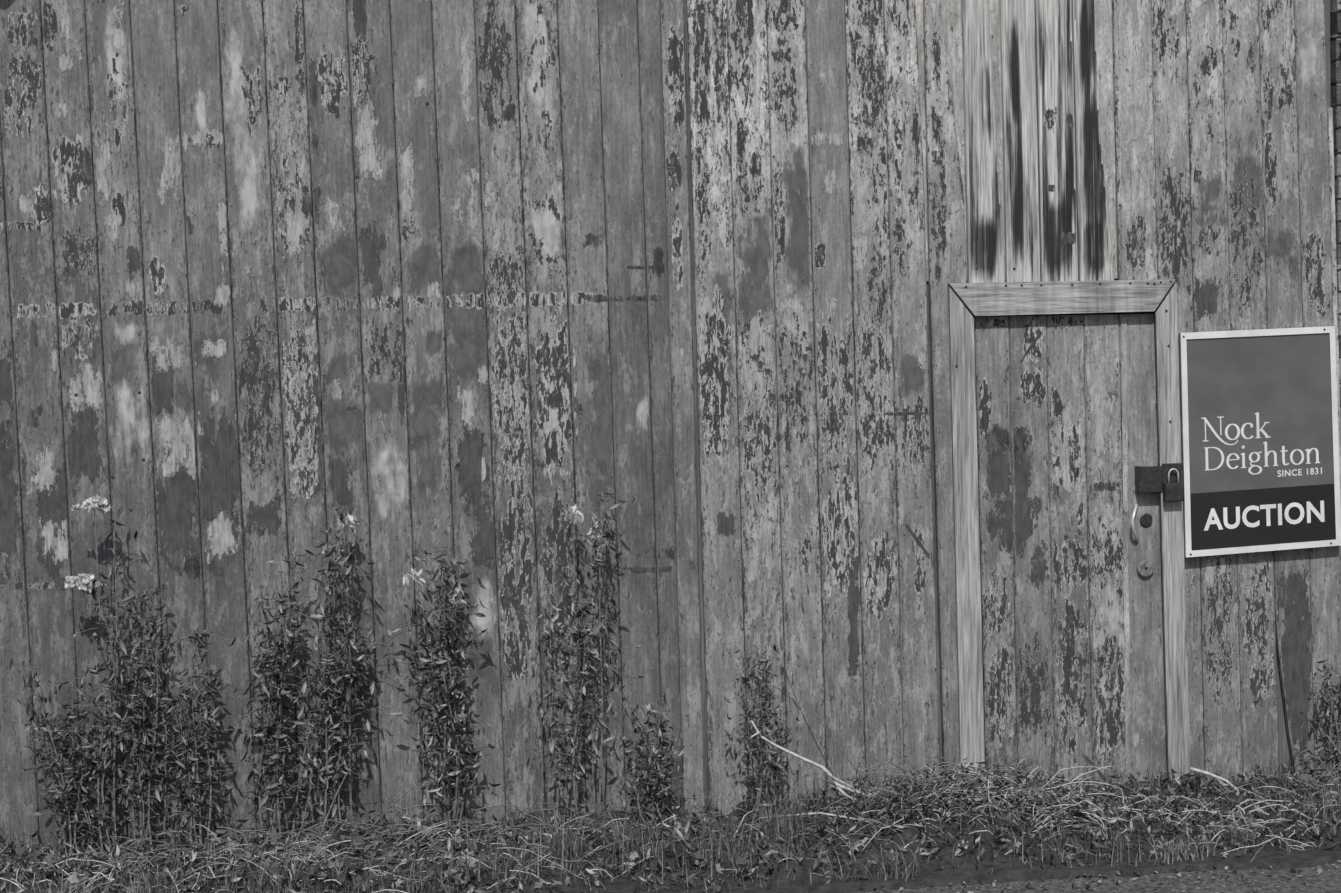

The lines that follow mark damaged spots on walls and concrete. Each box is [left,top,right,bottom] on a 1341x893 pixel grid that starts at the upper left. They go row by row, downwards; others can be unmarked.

peeling [0,0,58,140]
peeling [241,0,377,136]
peeling [29,133,96,277]
peeling [29,312,99,367]
peeling [111,185,126,233]
peeling [235,304,320,499]
peeling [277,130,321,274]
peeling [364,298,413,384]
peeling [582,0,960,631]
peeling [1122,0,1296,330]
peeling [1303,228,1331,319]
peeling [979,315,1132,766]